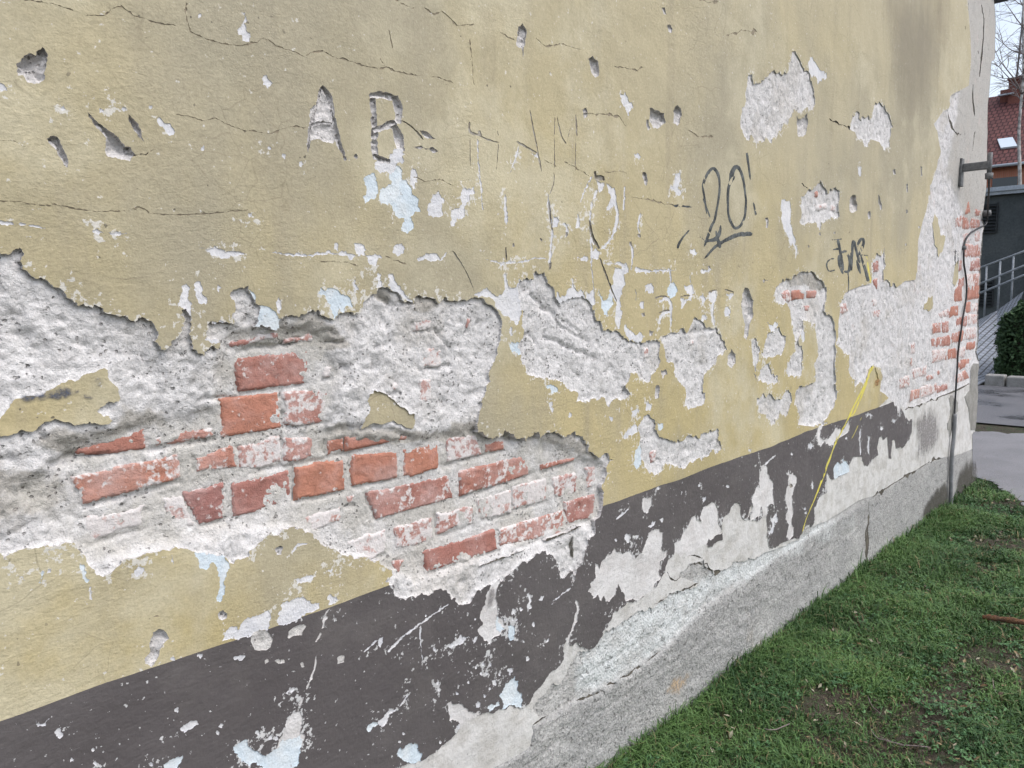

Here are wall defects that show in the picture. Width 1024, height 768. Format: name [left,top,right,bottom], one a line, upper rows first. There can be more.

spalling [16,47,48,84]
crack [24,0,474,83]
spalling [88,106,143,161]
crack [176,114,304,134]
crack [0,200,248,216]
peeling [363,161,475,234]
spalling [740,0,995,455]
spalling [0,247,736,667]
peeling [750,455,807,540]
peeling [448,663,523,730]
peeling [149,755,183,768]
peeling [233,711,305,768]